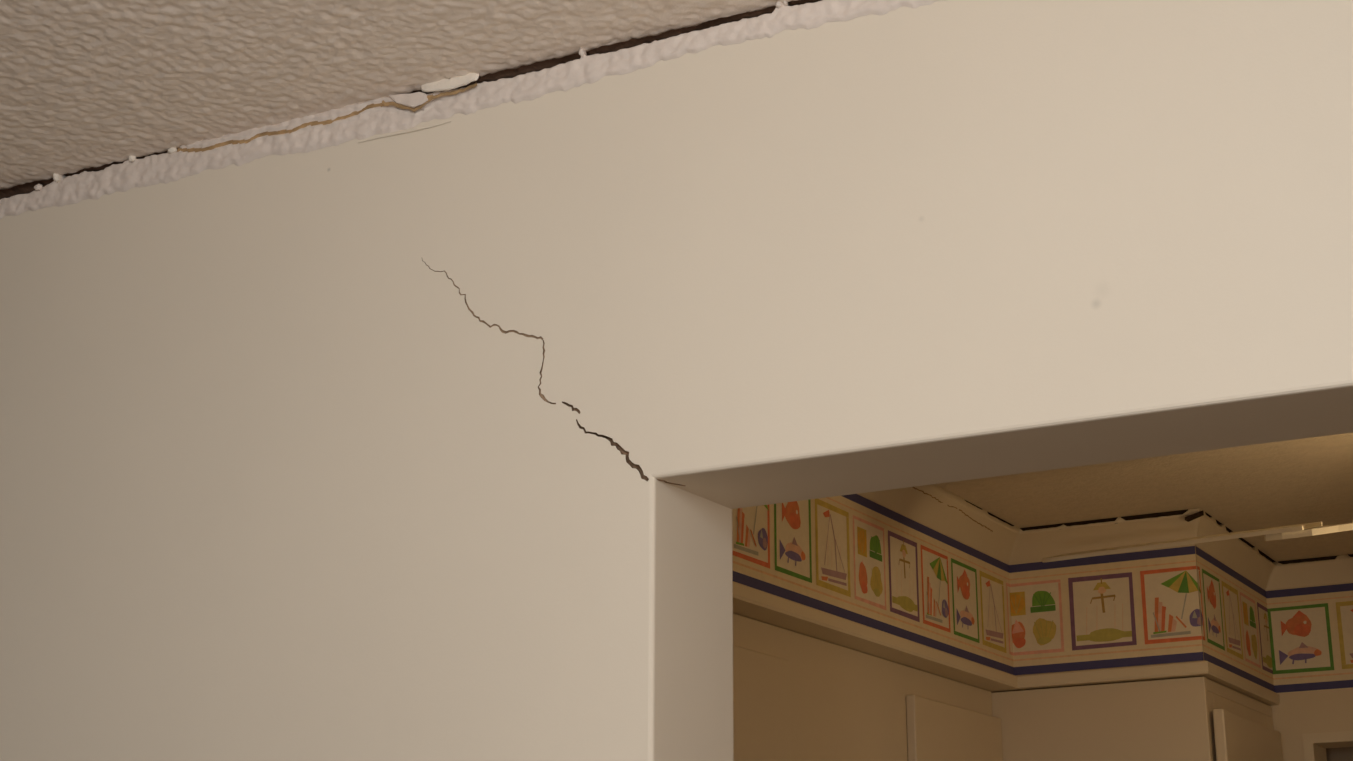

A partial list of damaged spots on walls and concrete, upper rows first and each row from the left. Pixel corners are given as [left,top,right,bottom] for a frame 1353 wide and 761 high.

crack [177,94,433,152]
crack [423,261,686,486]